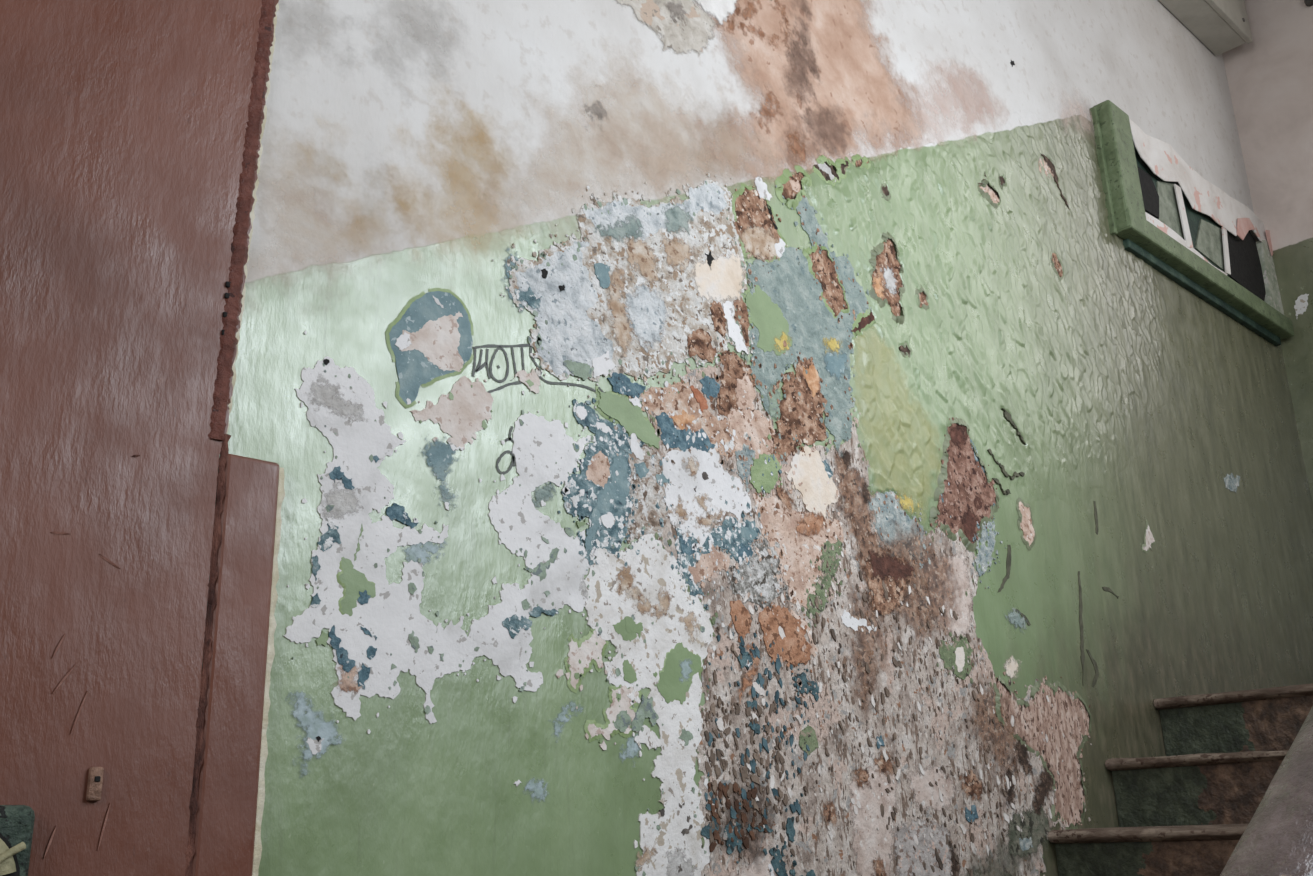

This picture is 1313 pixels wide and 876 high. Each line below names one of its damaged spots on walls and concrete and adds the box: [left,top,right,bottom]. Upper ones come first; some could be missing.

flaking render [616,0,739,54]
leakage [525,0,991,206]
peeling [1294,294,1309,319]
flaking render [284,154,1092,876]
peeling [1141,519,1156,553]